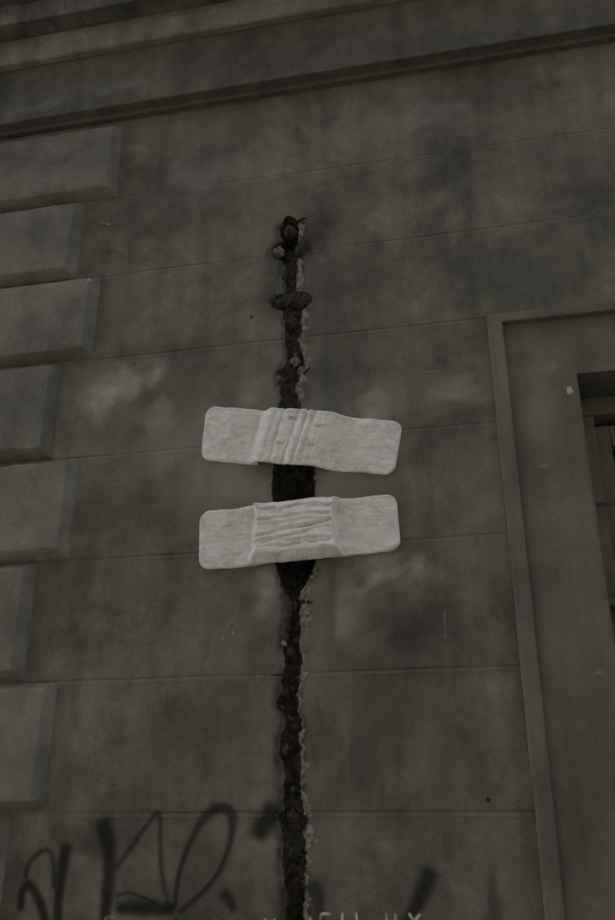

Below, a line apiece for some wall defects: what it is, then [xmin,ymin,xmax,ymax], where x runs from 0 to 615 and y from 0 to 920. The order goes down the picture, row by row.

crack [271,216,312,409]
crack [271,464,318,502]
crack [272,559,318,920]